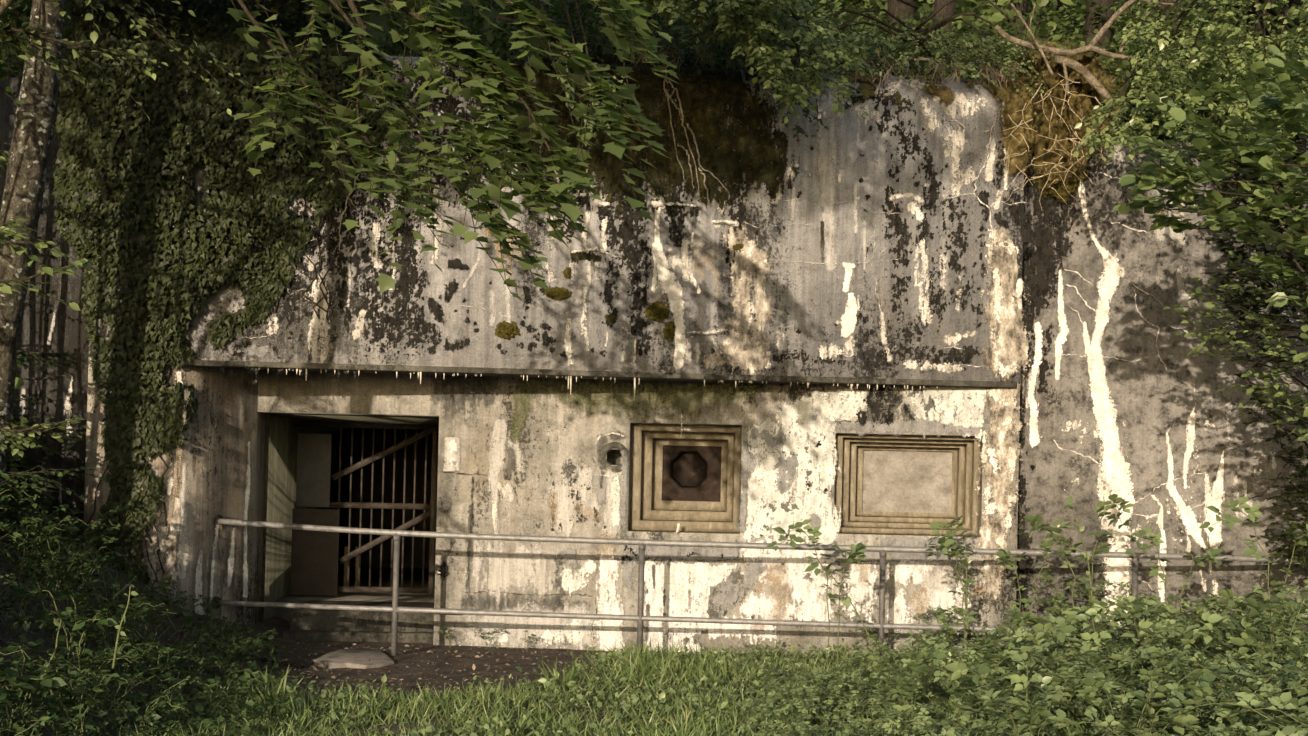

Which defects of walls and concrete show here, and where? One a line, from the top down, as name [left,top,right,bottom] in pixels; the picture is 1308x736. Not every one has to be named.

damp [160,57,740,617]
peeling [484,633,508,646]
damp [688,559,766,618]
damp [738,442,749,532]
peeling [528,224,1032,648]
damp [743,78,1278,627]